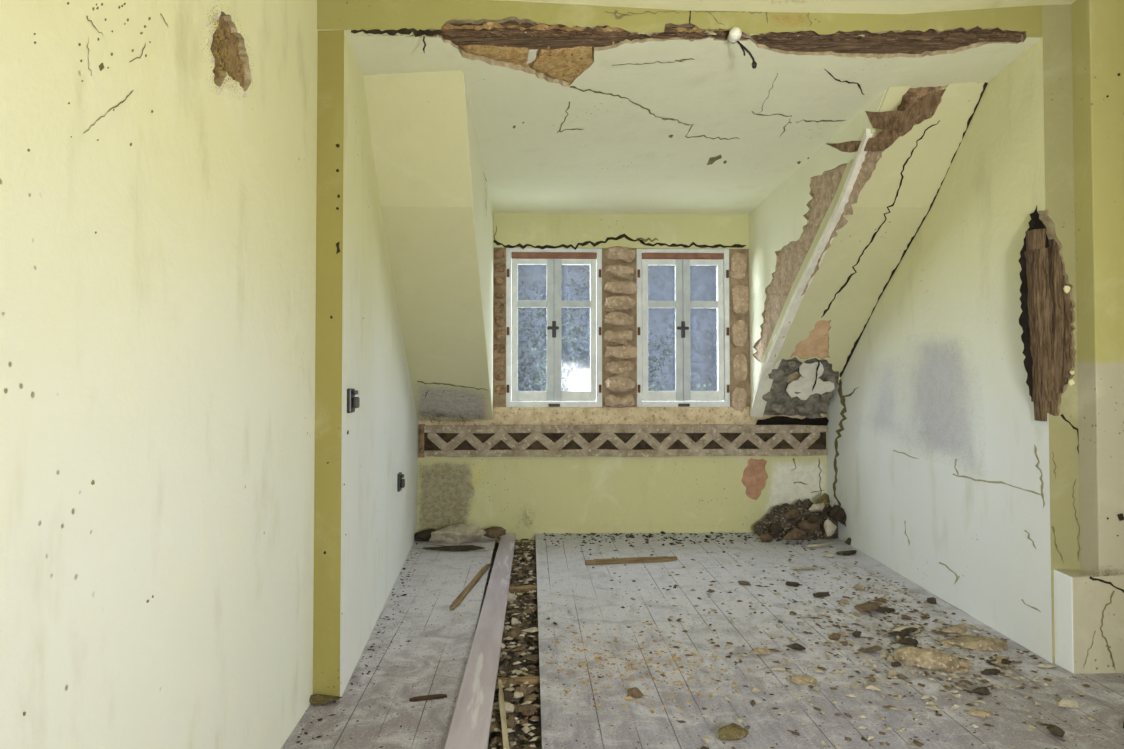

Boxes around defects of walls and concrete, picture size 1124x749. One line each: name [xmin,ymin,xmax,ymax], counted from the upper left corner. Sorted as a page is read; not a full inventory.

flaking render [201,1,254,98]
crack [556,86,739,140]
crack [612,58,695,66]
crack [605,10,768,32]
flaking render [429,0,1025,82]
crack [752,73,845,136]
crack [824,69,864,95]
flaking render [730,86,946,425]
crack [791,82,988,527]
flaking render [1018,206,1075,421]
peeling [741,457,827,516]
crack [952,414,1124,671]